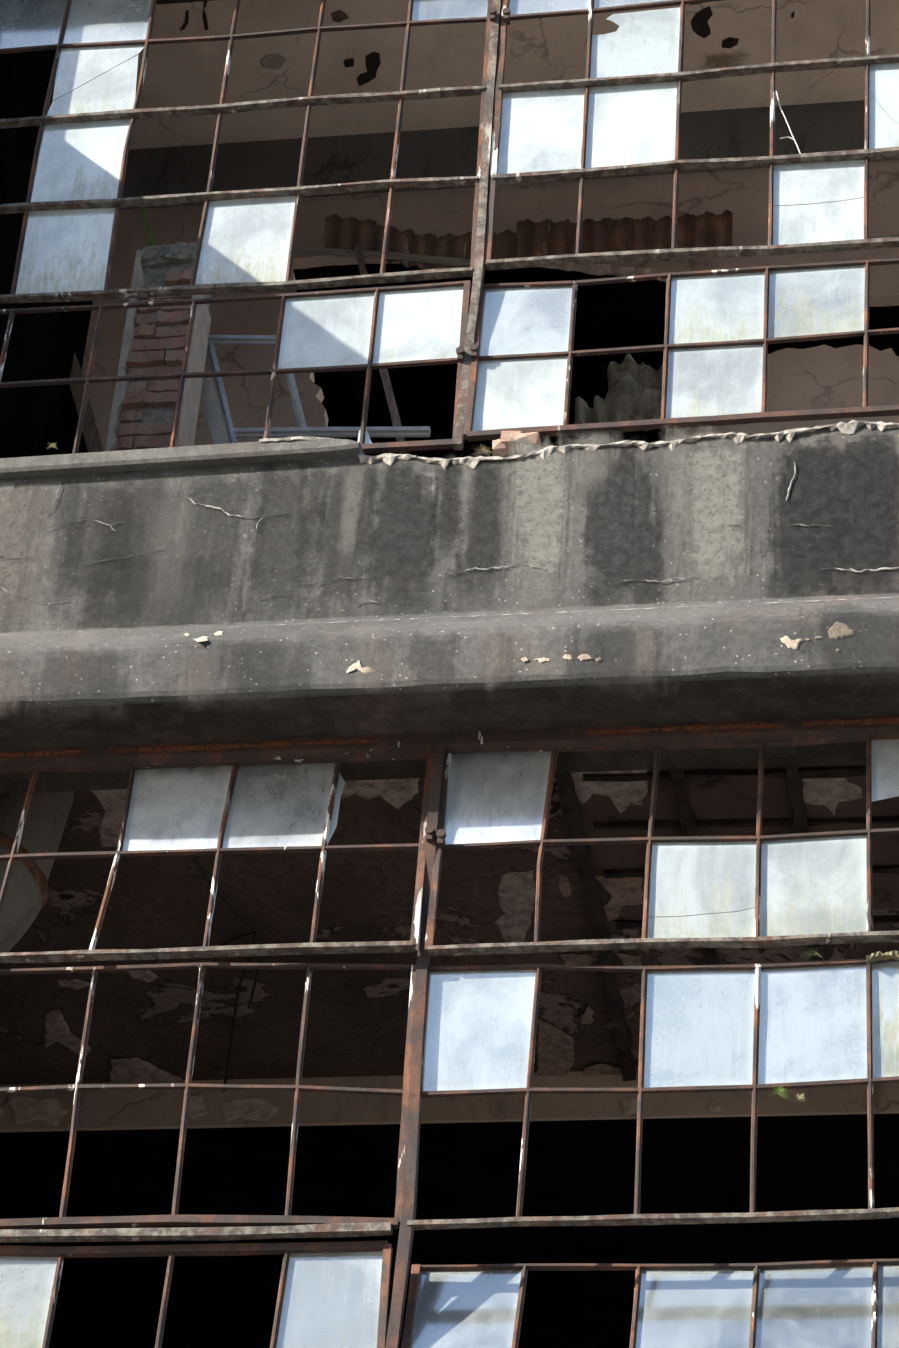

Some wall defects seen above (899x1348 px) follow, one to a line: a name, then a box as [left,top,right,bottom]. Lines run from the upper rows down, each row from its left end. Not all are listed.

spalling [358,420,899,470]
damp [0,482,41,606]
crack [169,488,289,530]
damp [317,432,899,606]
crack [786,463,828,526]
crack [822,565,899,573]
spalling [780,622,854,652]